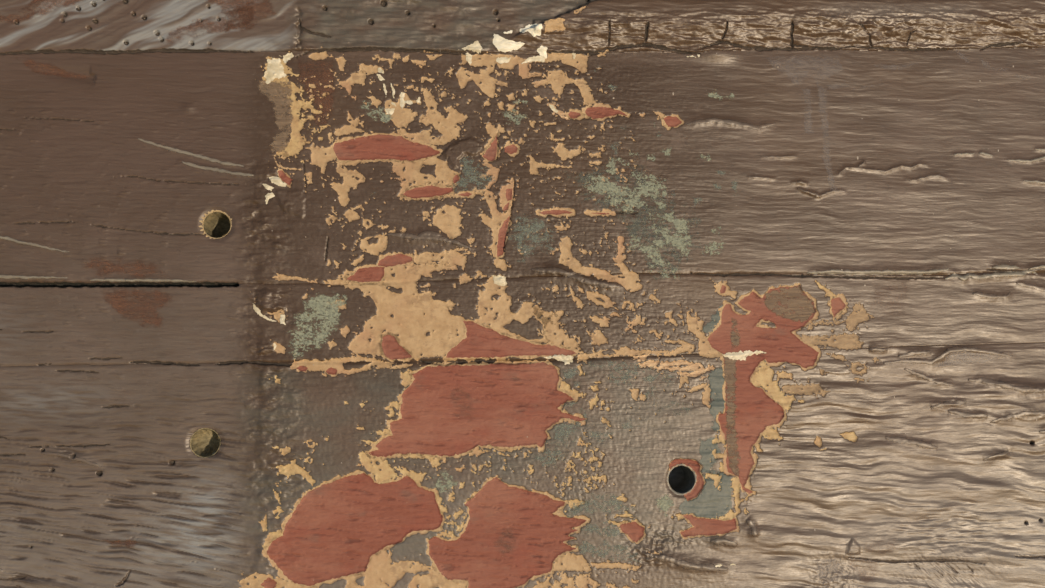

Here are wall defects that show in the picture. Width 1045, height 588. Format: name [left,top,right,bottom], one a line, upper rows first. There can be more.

peeling [238,5,879,588]
crack [0,576,26,588]
crack [115,571,131,587]